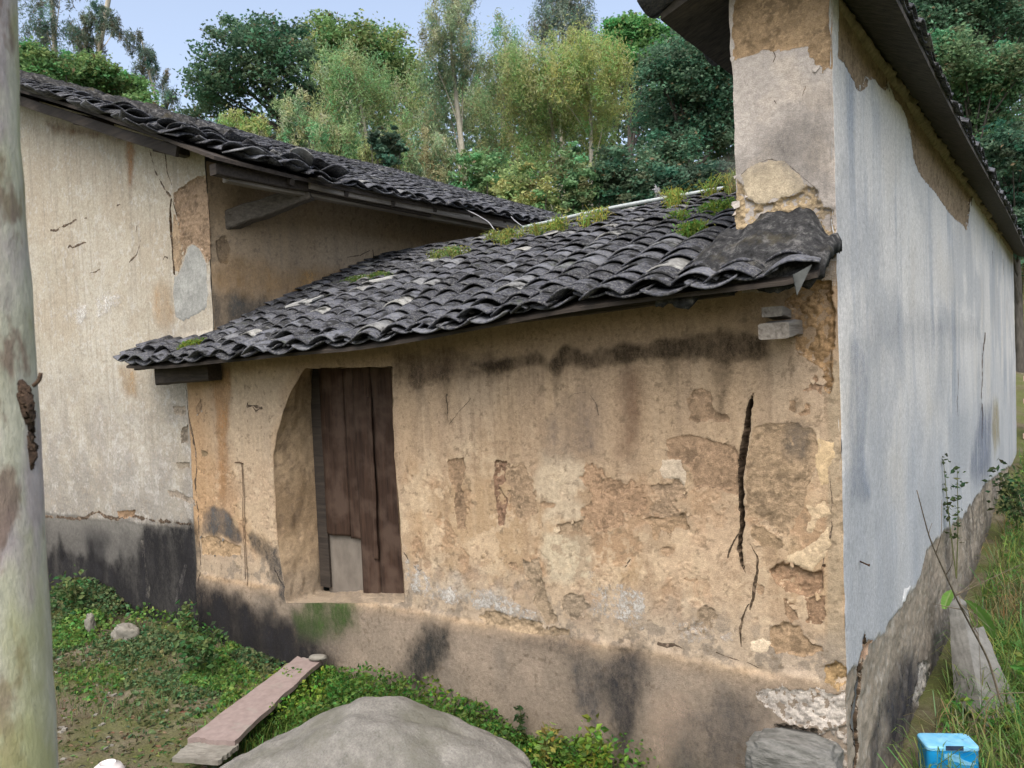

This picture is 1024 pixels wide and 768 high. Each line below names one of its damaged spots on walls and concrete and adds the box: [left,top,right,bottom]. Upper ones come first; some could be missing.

flaking render [730,0,971,235]
crack [150,152,179,275]
flaking render [171,173,231,273]
damp [527,330,767,371]
flaking render [446,457,468,529]
flaking render [493,460,556,528]
flaking render [553,280,837,657]
crack [716,393,759,668]
damp [47,507,329,677]
damp [401,628,449,688]
flaking render [756,660,847,768]